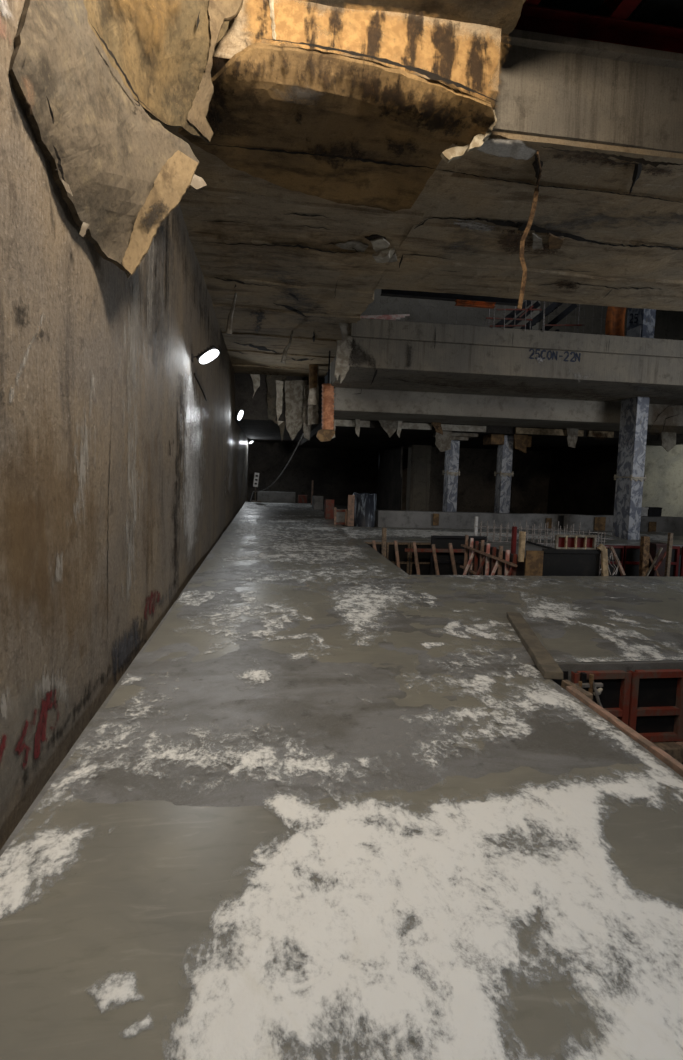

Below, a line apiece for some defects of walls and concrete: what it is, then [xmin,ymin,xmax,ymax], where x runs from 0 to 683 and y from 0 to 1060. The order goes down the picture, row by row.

leakage [207,0,500,144]
crack [202,143,683,203]
crack [414,217,683,250]
crack [539,269,654,299]
peeling [334,322,353,384]
leakage [117,216,232,604]
peeling [250,366,335,443]
leakage [0,367,207,803]